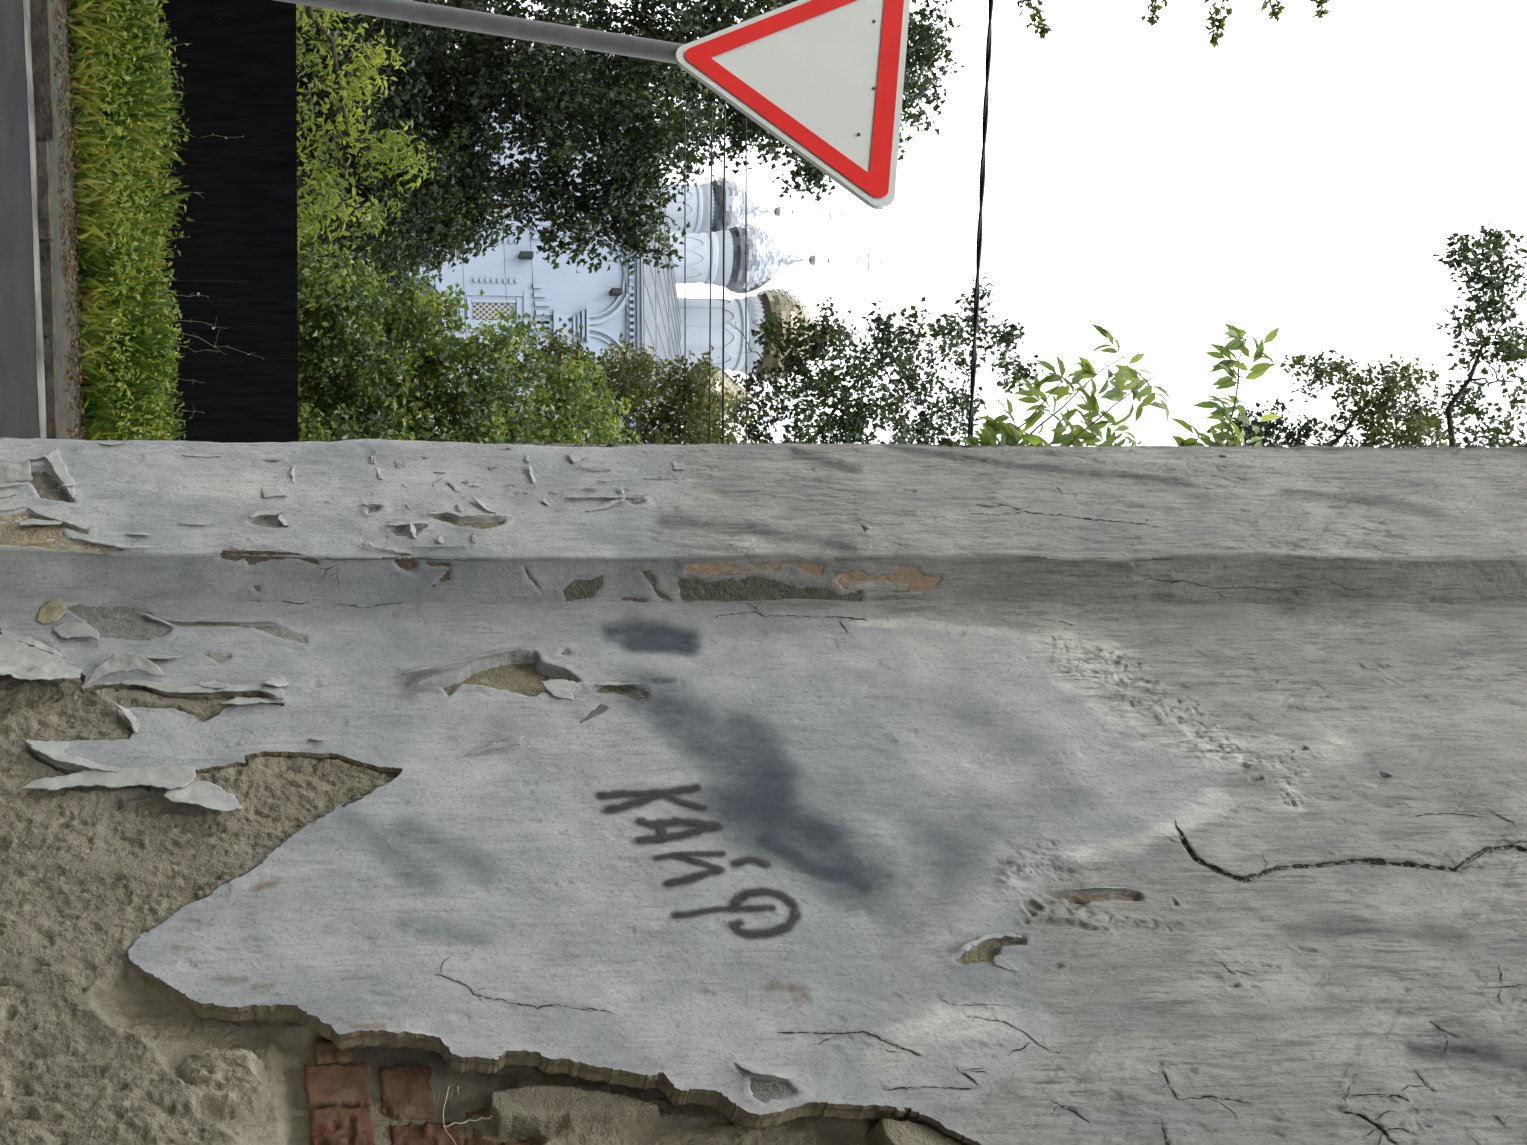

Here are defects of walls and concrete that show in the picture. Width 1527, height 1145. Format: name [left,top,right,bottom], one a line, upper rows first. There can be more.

peeling [0,437,153,554]
peeling [220,459,319,566]
peeling [362,454,508,587]
peeling [488,445,686,513]
spalling [0,598,981,1145]
spalling [1029,886,1137,908]
crack [1164,812,1527,882]
spalling [956,932,1022,971]
crack [1145,1069,1250,1145]
crack [1344,1021,1457,1145]